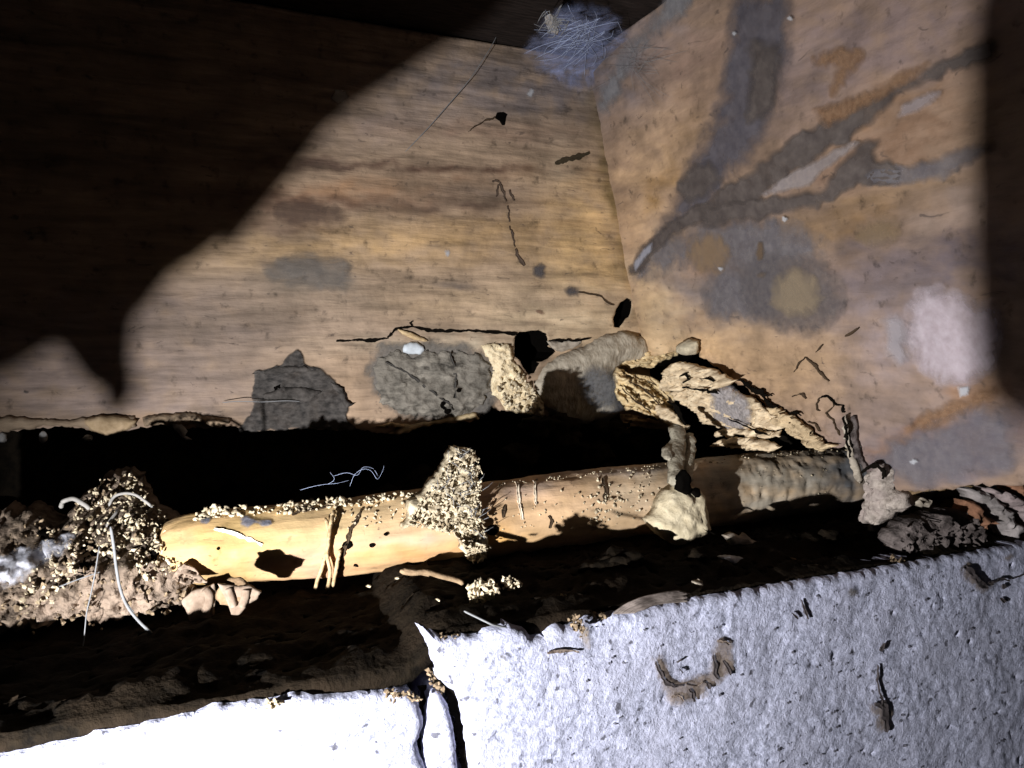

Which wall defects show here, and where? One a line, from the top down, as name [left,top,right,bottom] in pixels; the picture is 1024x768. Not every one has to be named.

leakage [629,0,993,329]
crack [492,180,525,266]
peeling [253,366,355,409]
crack [336,321,518,410]
peeling [388,388,479,435]
crack [579,292,614,305]
peeling [613,351,839,452]
crack [737,327,860,445]
leakage [889,291,998,396]
crack [871,643,891,733]